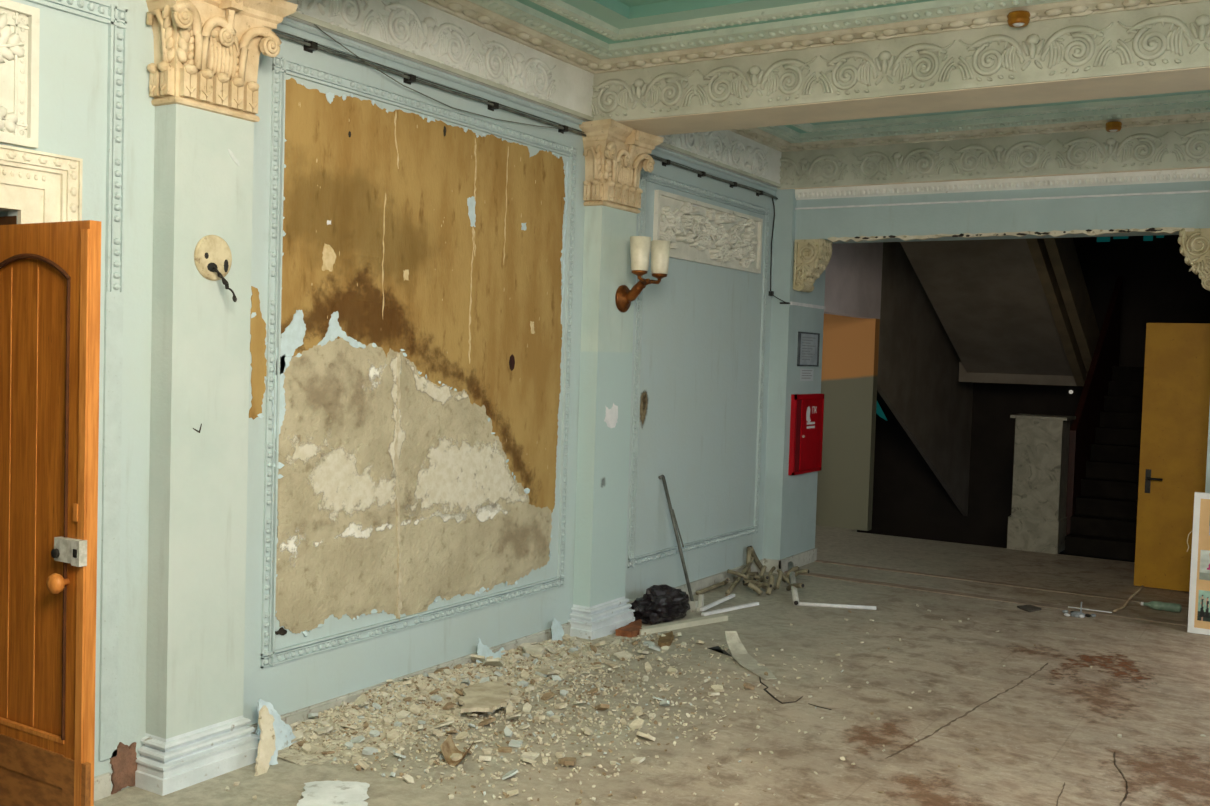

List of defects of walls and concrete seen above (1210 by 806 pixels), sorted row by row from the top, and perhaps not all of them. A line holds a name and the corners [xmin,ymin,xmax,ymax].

water stain [303,270,490,413]
peeling [249,78,567,636]
spalling [604,403,618,428]
water stain [502,428,529,482]
crack [1113,751,1128,806]